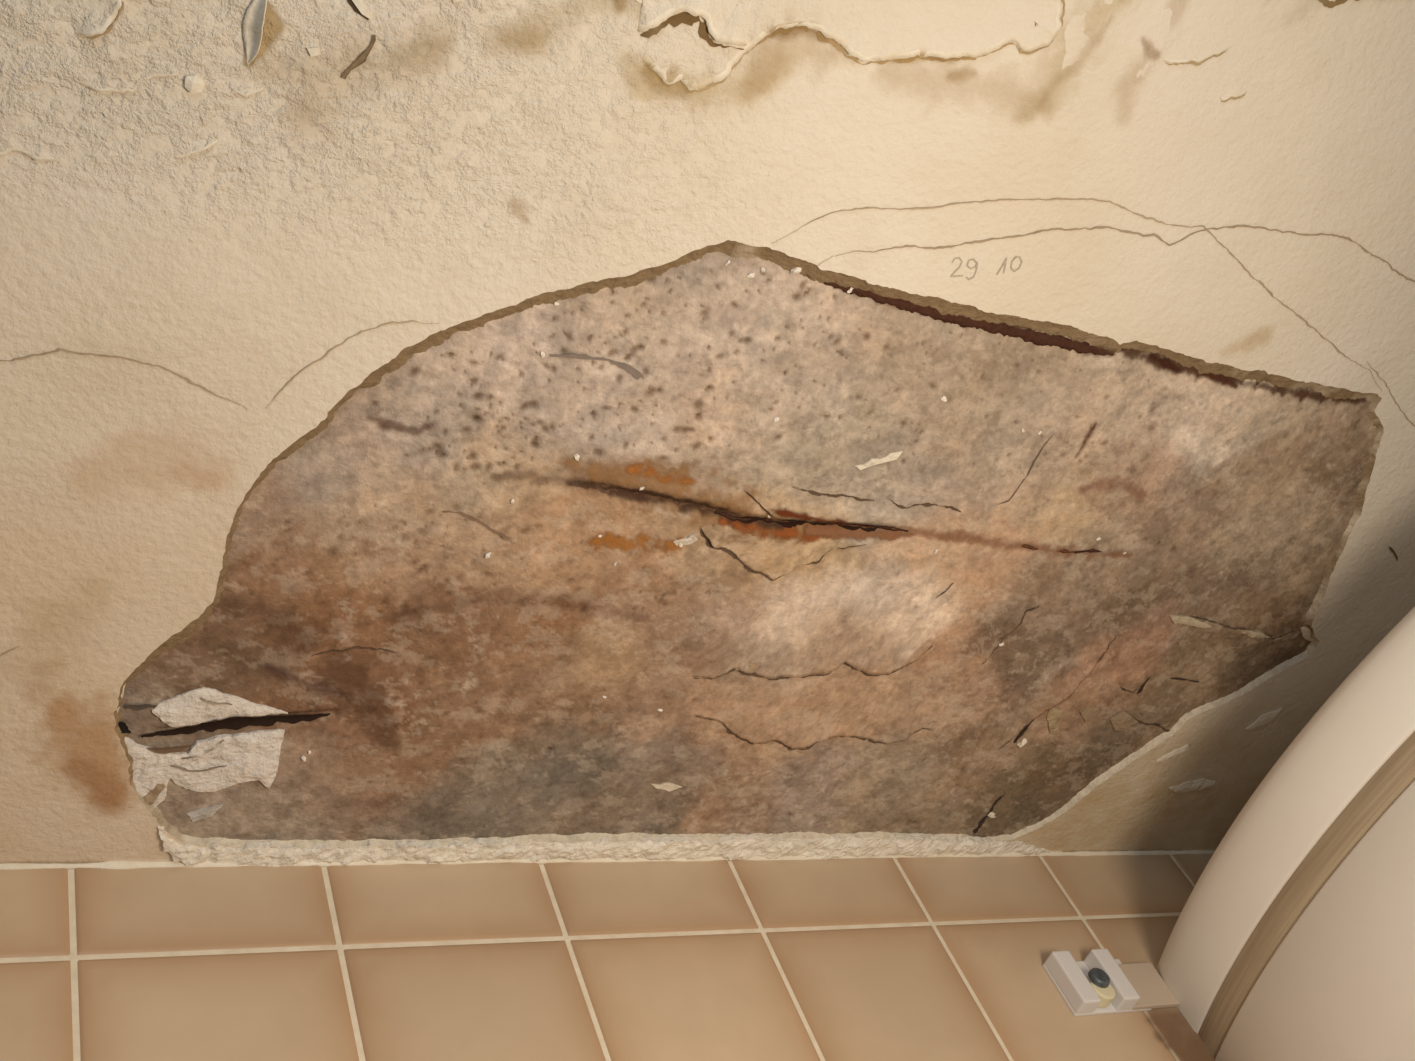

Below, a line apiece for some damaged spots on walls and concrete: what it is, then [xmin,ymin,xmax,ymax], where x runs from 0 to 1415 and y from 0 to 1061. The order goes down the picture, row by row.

peeling [243,0,283,67]
peeling [636,0,1065,93]
peeling [1319,0,1359,8]
crack [771,198,1415,427]
corrosion [590,533,683,552]
crack [569,485,908,532]
spalling [114,240,1384,867]
corrosion [565,460,998,543]
corrosion [1016,544,1074,556]
crack [1022,544,1102,554]
water stain [51,701,125,805]
crack [118,698,330,772]